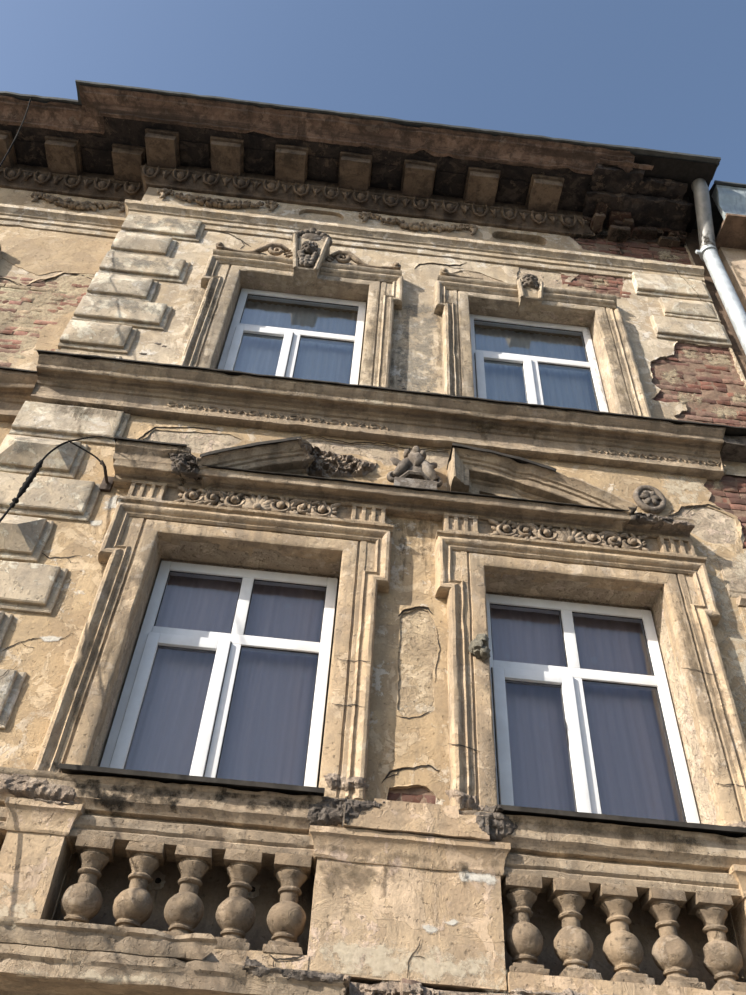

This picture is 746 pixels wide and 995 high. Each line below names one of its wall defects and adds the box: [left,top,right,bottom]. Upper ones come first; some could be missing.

flaking render [572,229,692,265]
crack [0,272,93,286]
flaking render [516,267,631,299]
flaking render [0,274,95,367]
flaking render [649,341,746,427]
crack [134,423,224,440]
peeling [670,471,746,578]
crack [0,634,70,677]
crack [379,760,440,783]
flaking render [387,784,436,804]